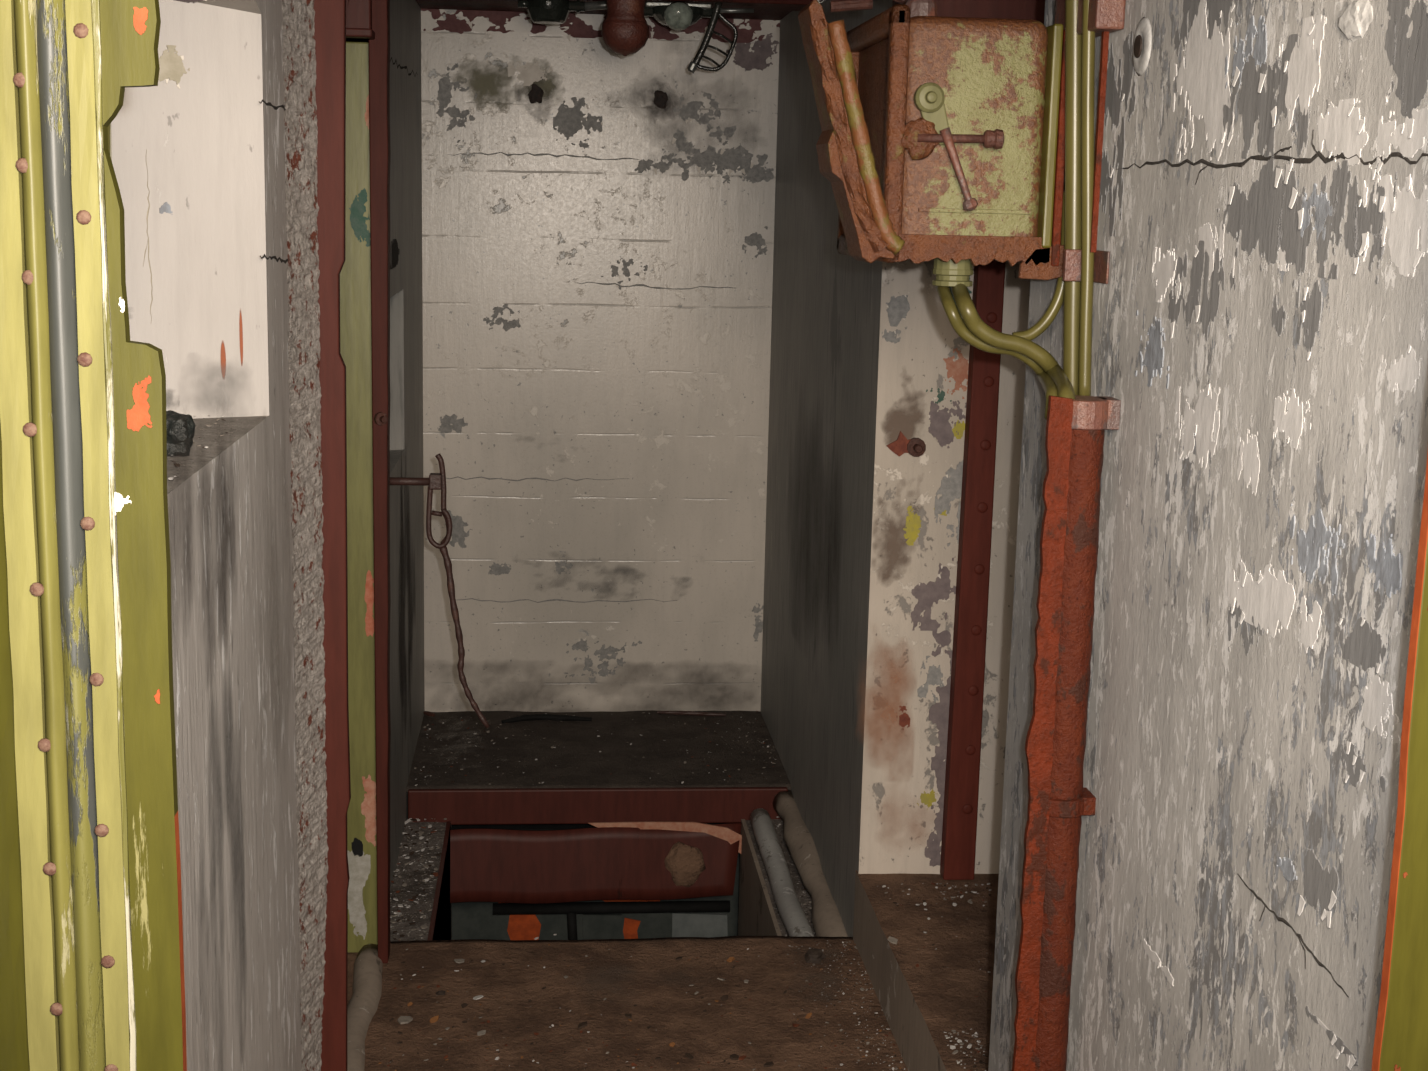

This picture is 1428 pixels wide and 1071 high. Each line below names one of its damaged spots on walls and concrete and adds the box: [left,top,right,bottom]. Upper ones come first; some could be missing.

damp [457,69,556,106]
peeling [421,9,607,41]
peeling [647,16,780,71]
peeling [1099,17,1152,237]
crack [1117,130,1428,185]
peeling [1134,0,1428,469]
peeling [1237,388,1311,496]
spalling [282,0,328,1071]
peeling [911,460,963,867]
peeling [1227,503,1403,745]
peeling [347,775,377,939]
crack [1238,874,1349,997]